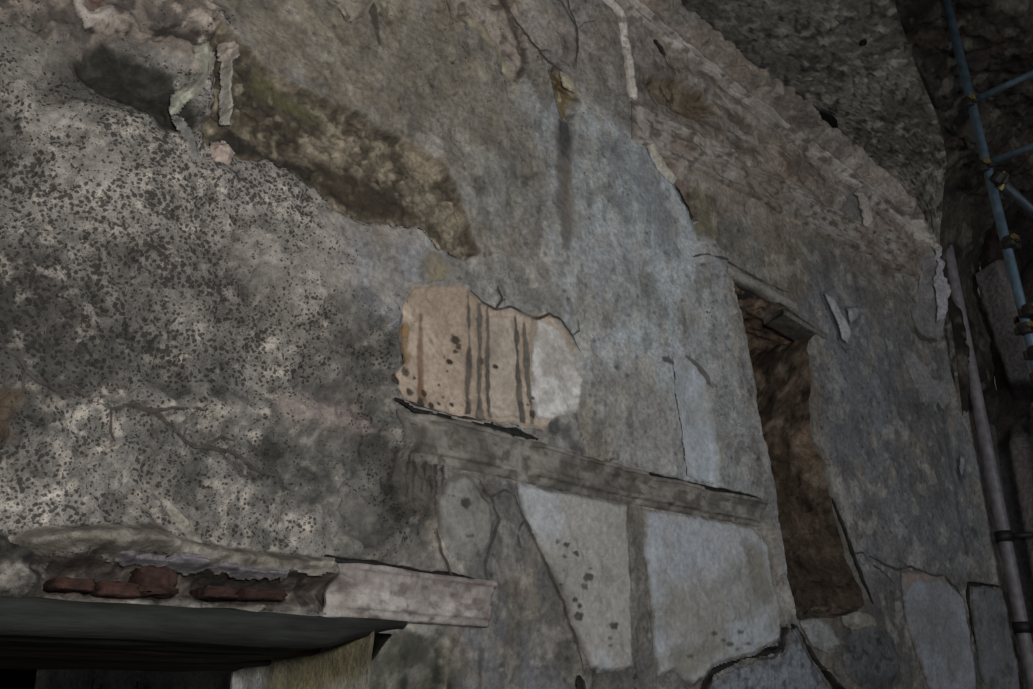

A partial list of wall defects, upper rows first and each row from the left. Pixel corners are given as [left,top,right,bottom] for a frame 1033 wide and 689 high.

peeling [72,0,116,30]
crack [509,0,596,73]
damp [169,40,240,166]
spalling [198,13,484,261]
damp [557,120,571,215]
spalling [820,288,865,353]
crack [5,348,271,476]
crack [324,478,586,689]
crack [831,498,1003,643]
crack [701,624,845,689]